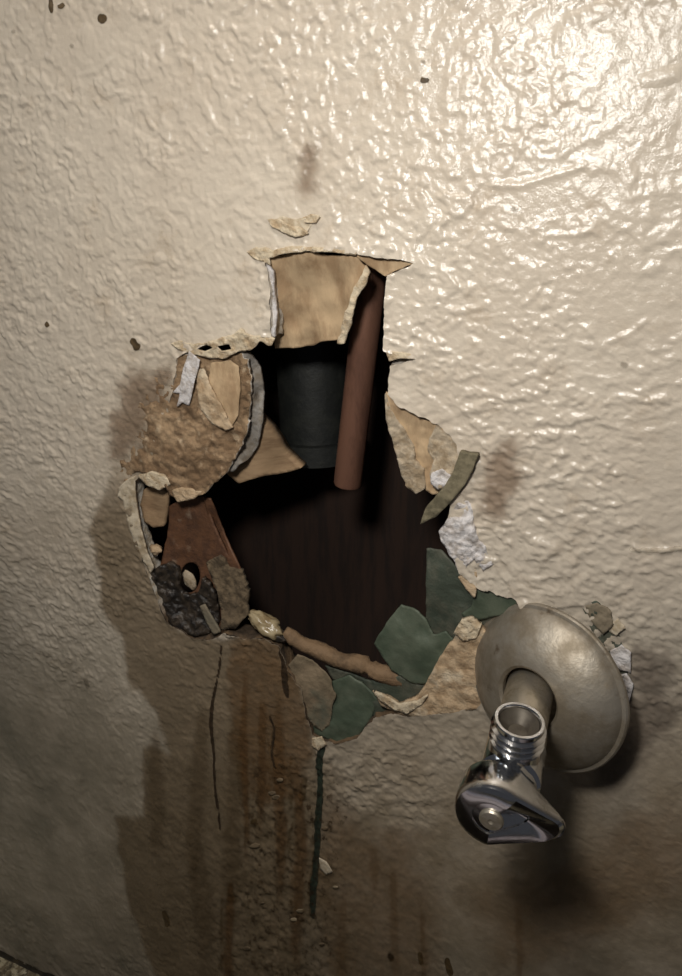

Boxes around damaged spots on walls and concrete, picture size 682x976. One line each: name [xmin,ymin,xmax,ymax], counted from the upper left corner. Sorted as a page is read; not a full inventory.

spalling [117,214,517,744]
leakage [92,509,313,976]
crack [209,646,222,829]
crack [310,736,333,919]
peeling [583,601,633,701]